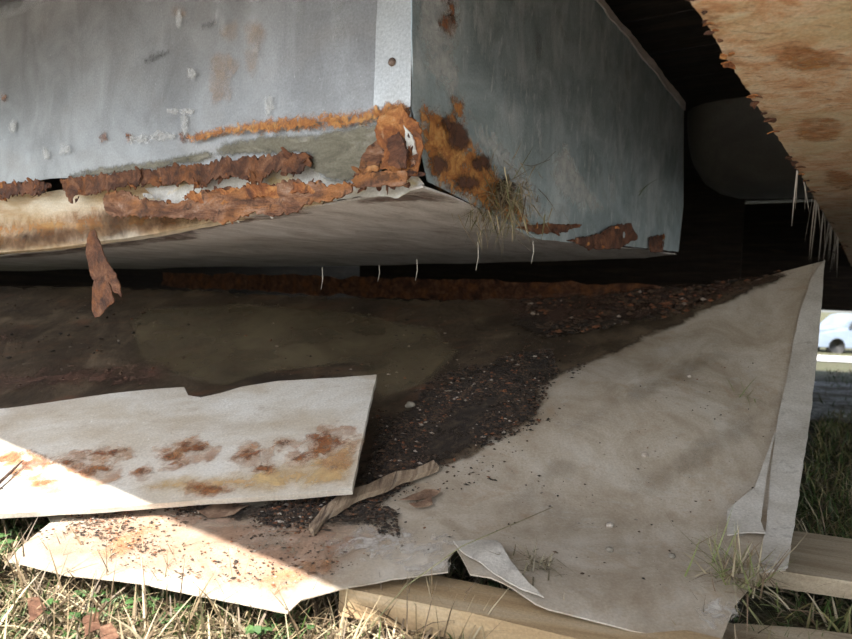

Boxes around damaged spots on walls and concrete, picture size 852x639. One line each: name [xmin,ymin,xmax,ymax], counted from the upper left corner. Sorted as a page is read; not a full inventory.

corrosion [438,0,456,37]
corrosion [0,96,528,228]
corrosion [6,230,198,318]